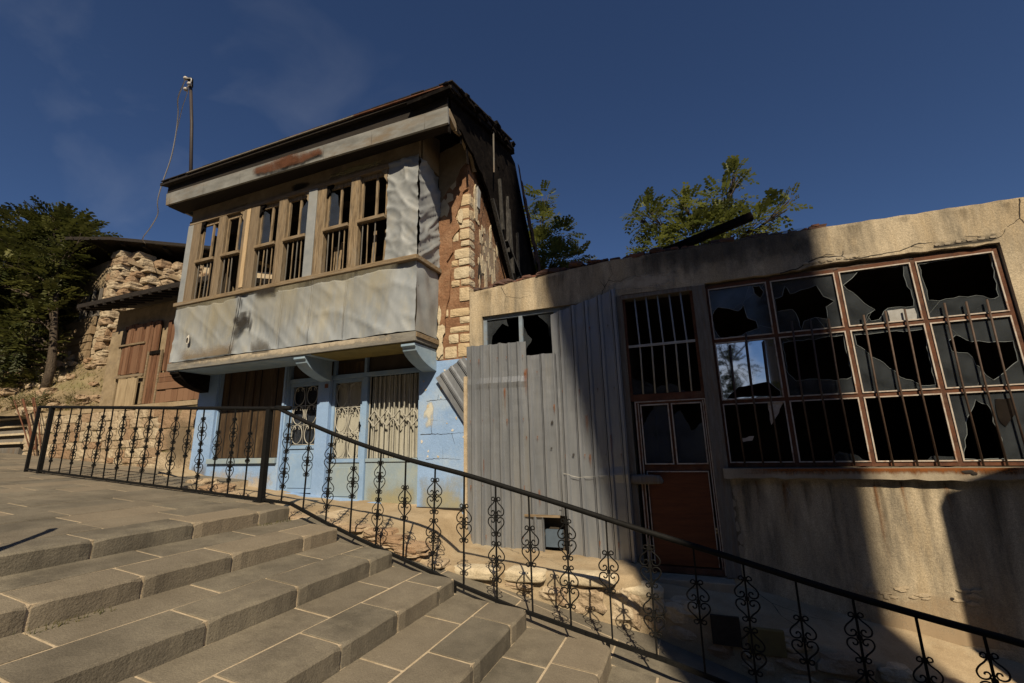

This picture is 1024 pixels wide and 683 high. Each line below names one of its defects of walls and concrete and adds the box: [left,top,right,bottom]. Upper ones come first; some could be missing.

rust [254,149,322,174]
peeling [436,109,498,371]
crack [780,198,1024,274]
peeling [423,381,442,426]